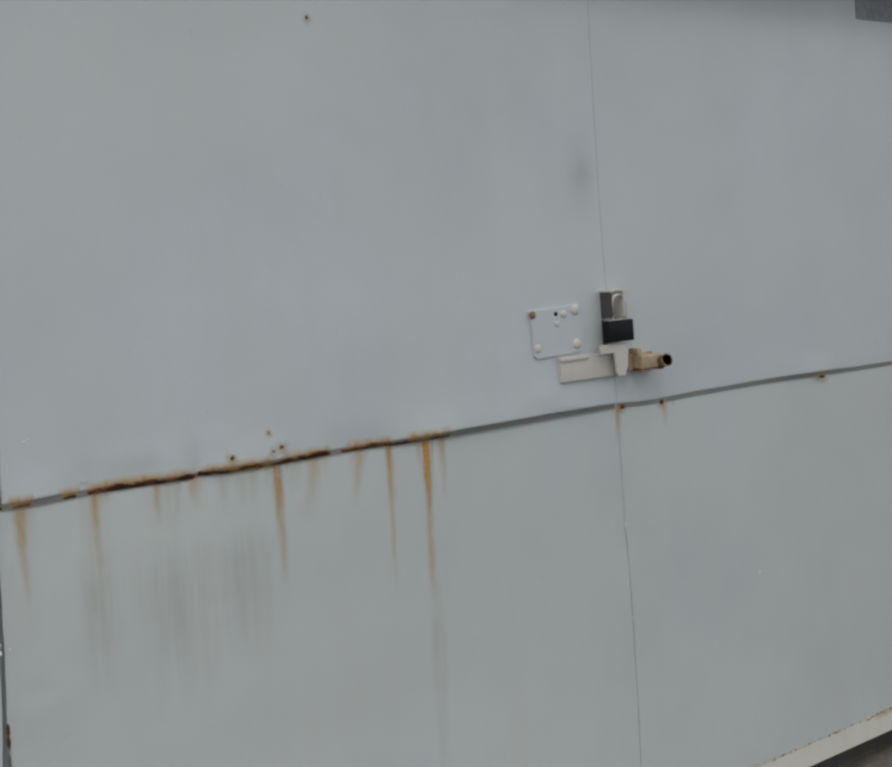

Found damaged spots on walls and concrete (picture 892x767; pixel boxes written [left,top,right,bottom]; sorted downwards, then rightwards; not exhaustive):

rust [87,434,450,503]